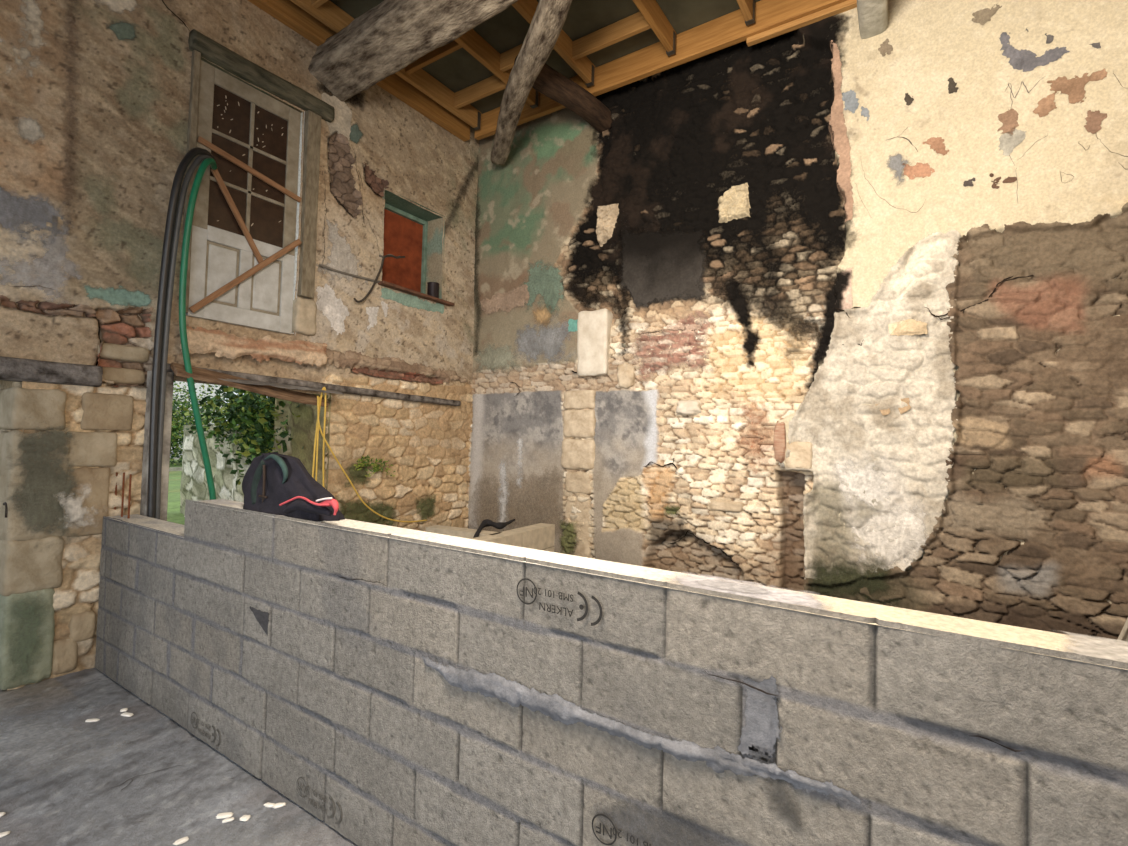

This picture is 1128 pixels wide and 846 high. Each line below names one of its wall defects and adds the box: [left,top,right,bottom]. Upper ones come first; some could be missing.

peeling [972,4,1002,25]
peeling [999,32,1070,72]
peeling [1033,69,1108,134]
peeling [998,109,1026,156]
spalling [328,132,389,218]
crack [925,275,1034,320]
spalling [632,311,712,379]
spalling [785,203,1128,639]
water stain [60,489,90,527]
water stain [476,464,561,531]
crack [704,670,777,696]
crack [974,735,1022,752]